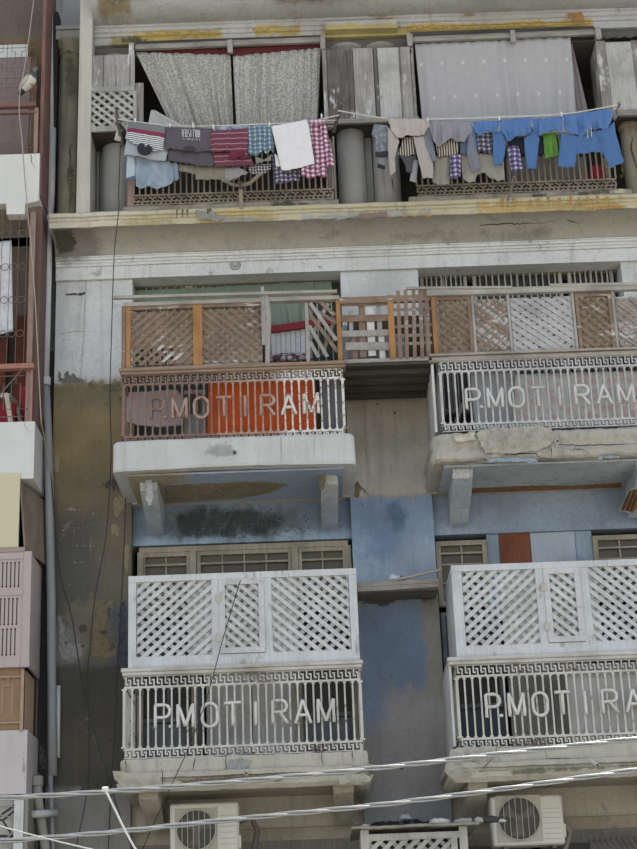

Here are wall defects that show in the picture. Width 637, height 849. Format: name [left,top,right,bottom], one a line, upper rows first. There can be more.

crack [480,218,580,226]
peeling [58,371,122,404]
water stain [170,505,315,539]
peeling [122,543,130,575]
peeling [56,598,117,661]
spalling [113,771,162,787]
spalling [177,774,283,784]
spalling [338,773,371,784]